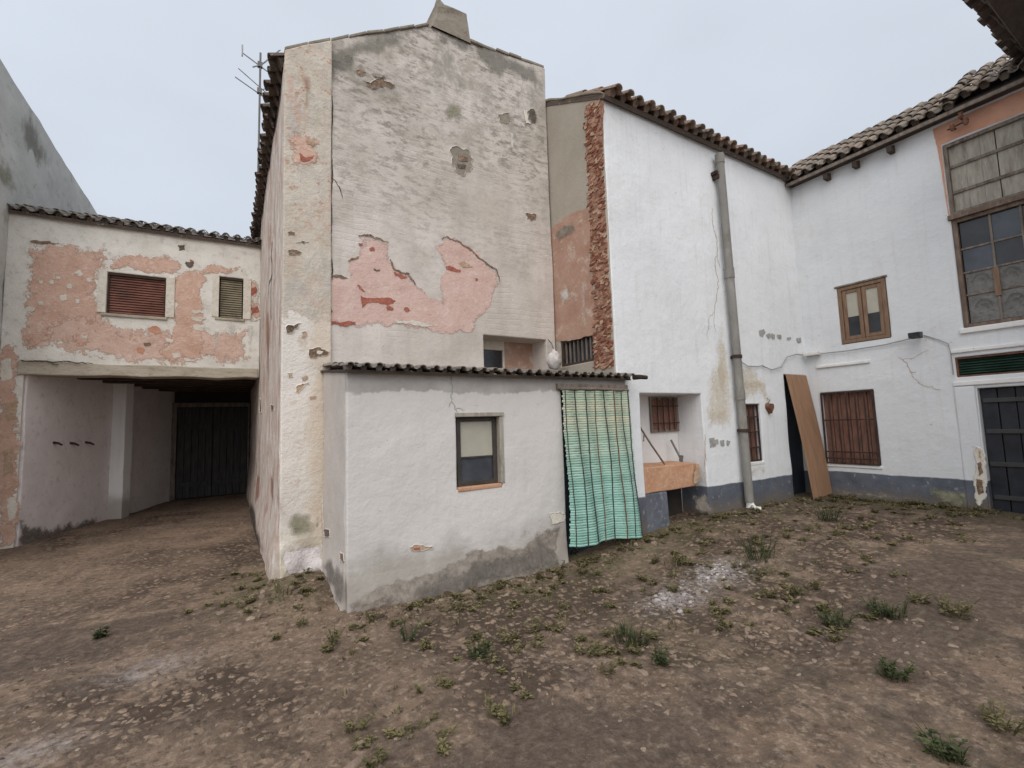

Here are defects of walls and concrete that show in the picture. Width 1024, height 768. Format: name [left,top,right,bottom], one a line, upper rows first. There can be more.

spalling [333,55,395,90]
peeling [287,130,320,166]
spalling [449,145,474,177]
peeling [331,234,500,334]
peeling [0,240,260,547]
peeling [973,446,988,506]
damp [290,516,309,534]
peeling [410,544,433,552]
damp [325,527,560,612]